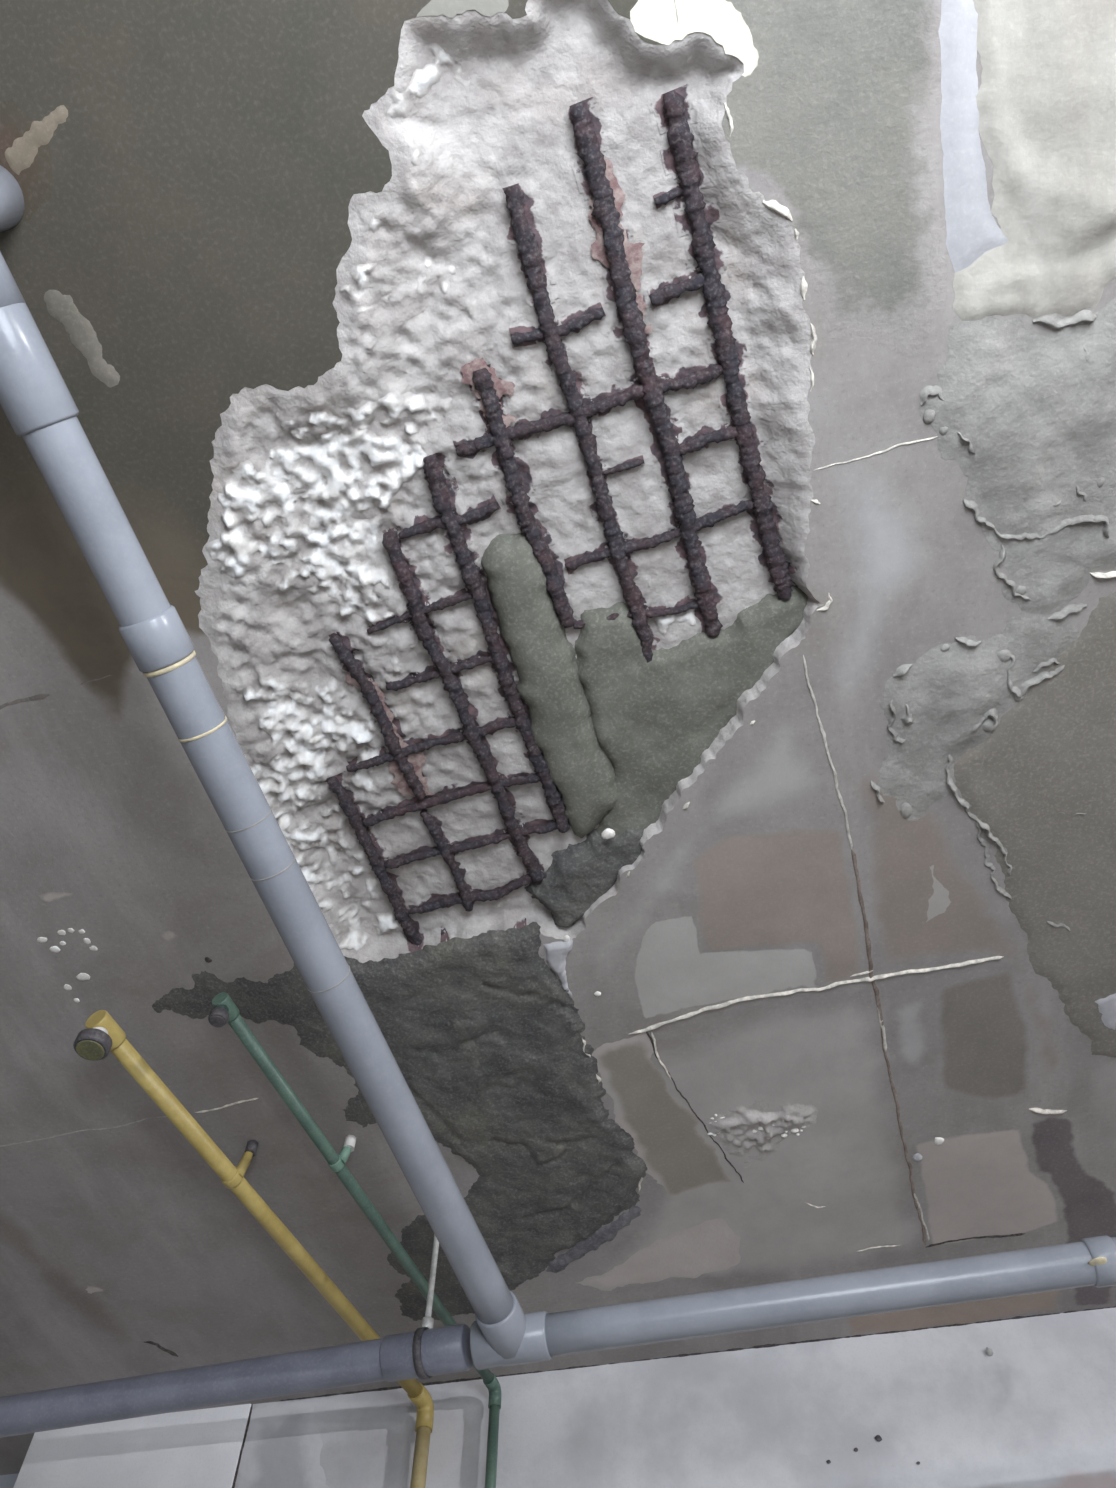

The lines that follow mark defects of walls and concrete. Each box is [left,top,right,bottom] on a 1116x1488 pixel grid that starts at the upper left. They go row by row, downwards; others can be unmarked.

leakage [0,405,144,741]
leakage [0,0,431,643]
rust [345,672,435,796]
rust [460,358,516,427]
spalling [195,0,823,996]
crack [582,1038,601,1084]
rust [588,158,654,334]
crack [628,655,1025,1252]
leakage [721,0,949,363]
leakage [575,430,1116,1293]
flaking render [870,297,1116,821]
crack [232,1306,1116,1488]